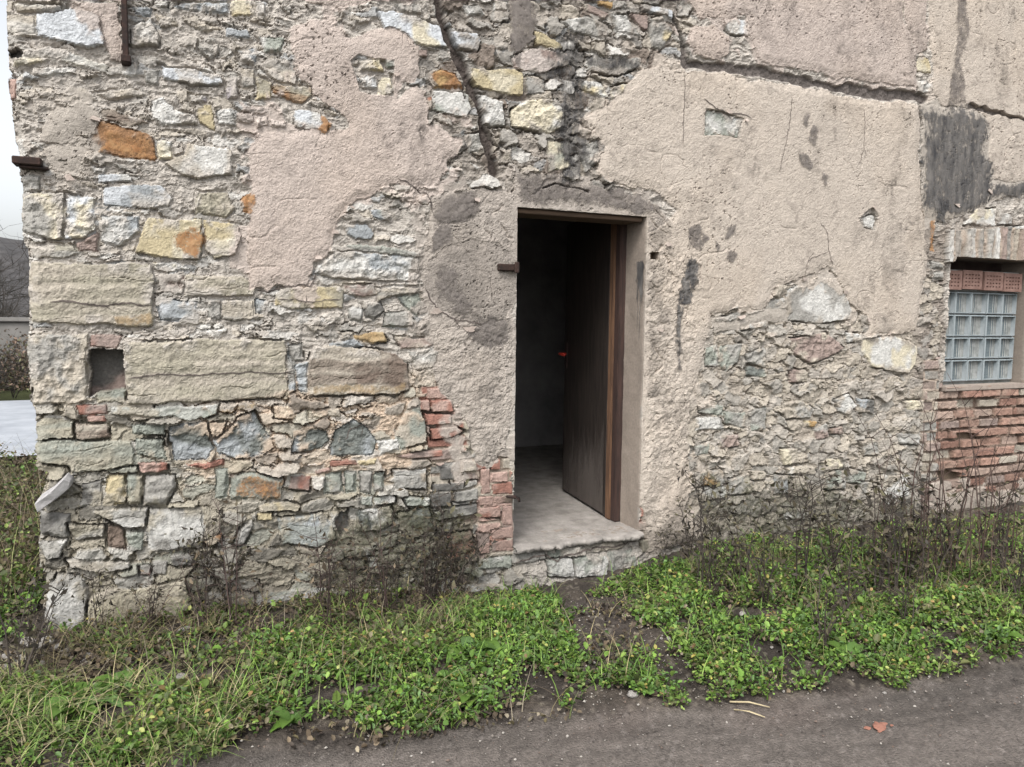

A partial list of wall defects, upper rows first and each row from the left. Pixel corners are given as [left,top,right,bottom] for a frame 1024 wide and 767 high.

peeling [40,97,102,181]
spalling [356,54,399,97]
crack [672,14,928,216]
leakage [799,114,827,185]
leakage [948,0,969,108]
crack [968,102,1024,121]
peeling [314,175,531,349]
leakage [432,192,479,252]
leakage [435,265,508,349]
leakage [675,224,737,370]
peeling [645,217,921,420]
spalling [859,206,880,231]